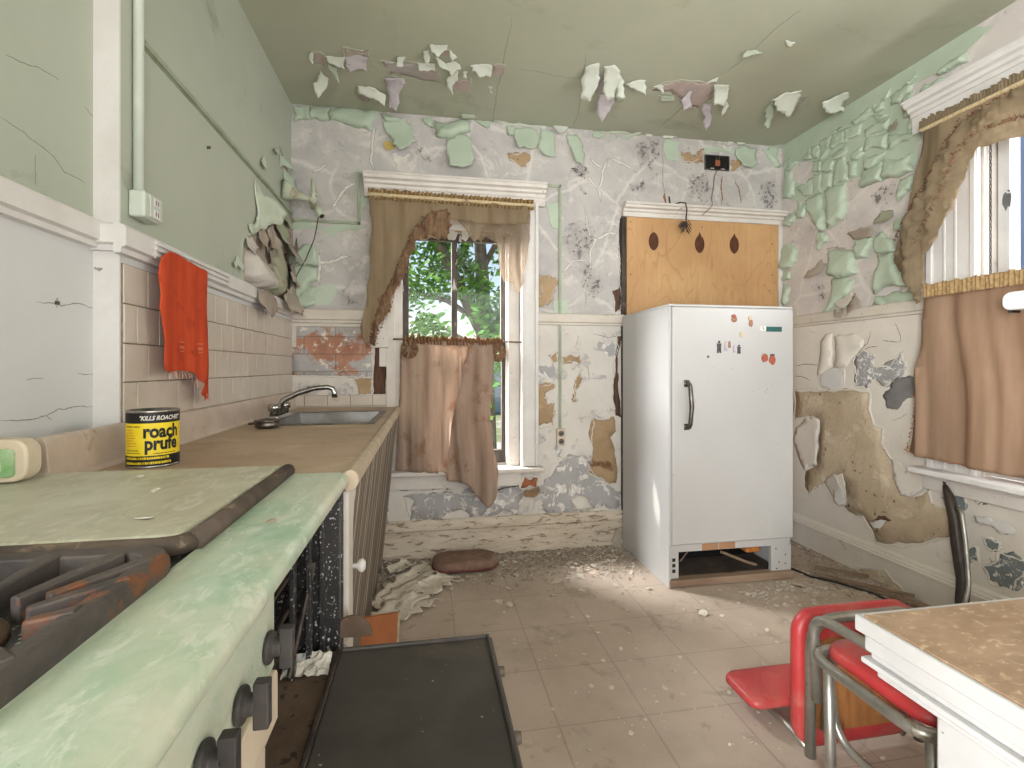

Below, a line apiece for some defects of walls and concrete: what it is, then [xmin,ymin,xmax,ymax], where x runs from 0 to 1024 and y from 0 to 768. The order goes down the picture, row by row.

crack [4,119,82,184]
peeling [292,25,994,318]
peeling [234,180,374,395]
crack [1,405,92,421]
peeling [402,335,621,521]
flaking render [793,349,1024,593]